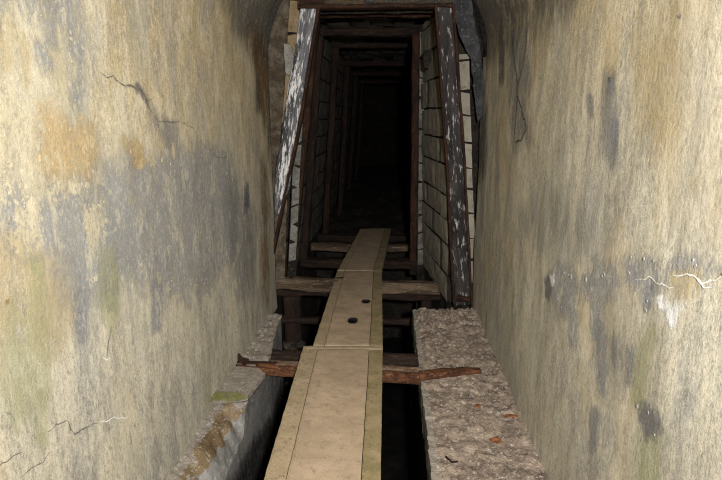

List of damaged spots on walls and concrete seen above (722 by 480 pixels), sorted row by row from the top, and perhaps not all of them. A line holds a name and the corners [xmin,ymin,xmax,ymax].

crack [103,74,227,158]
crack [509,28,529,151]
leakage [587,74,619,162]
leakage [656,295,687,329]
crack [48,416,127,435]